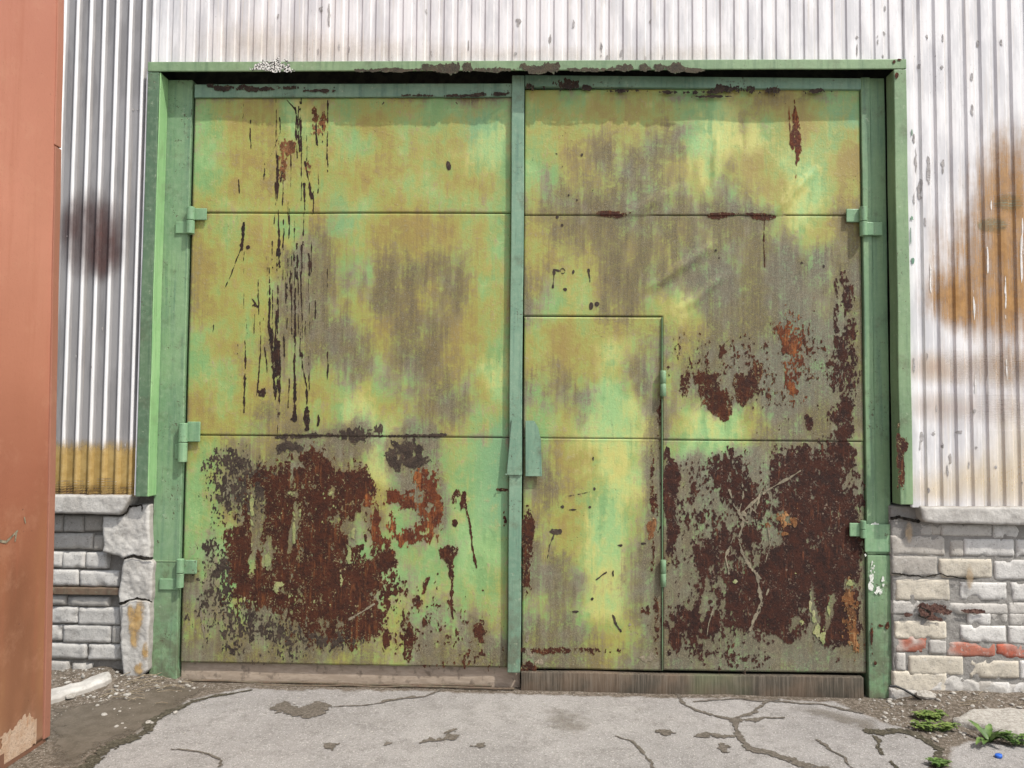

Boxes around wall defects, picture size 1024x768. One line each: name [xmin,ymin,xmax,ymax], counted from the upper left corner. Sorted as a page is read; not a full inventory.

corrosion [354,61,705,76]
corrosion [278,138,297,180]
corrosion [310,106,328,135]
corrosion [788,99,802,178]
corrosion [931,141,1024,336]
corrosion [657,269,880,675]
crack [120,504,143,516]
crack [124,553,153,561]
corrosion [184,441,500,671]
crack [119,597,152,605]
corrosion [520,646,621,672]
peeling [0,713,37,764]